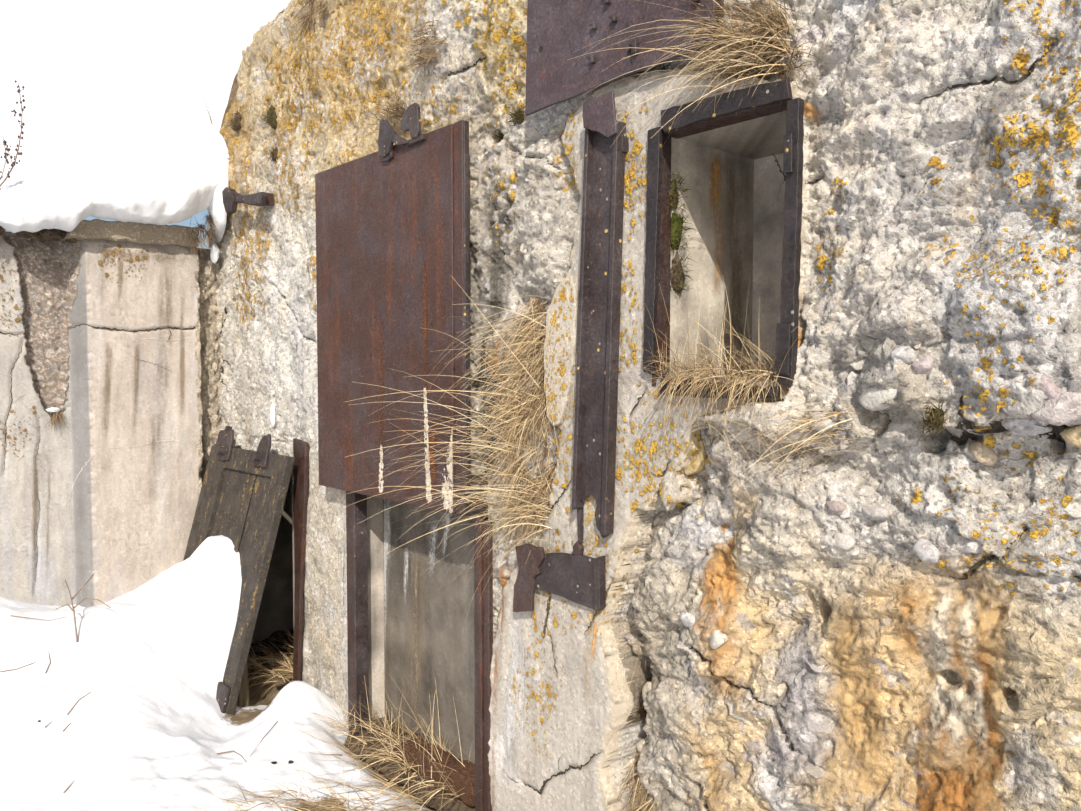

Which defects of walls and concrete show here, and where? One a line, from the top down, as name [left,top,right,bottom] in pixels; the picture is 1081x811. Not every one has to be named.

crack [920,44,1054,101]
spalling [3,232,83,421]
crack [0,332,23,476]
rust [701,523,738,668]
crack [508,752,601,795]
rust [830,616,882,806]
rust [916,587,1005,811]